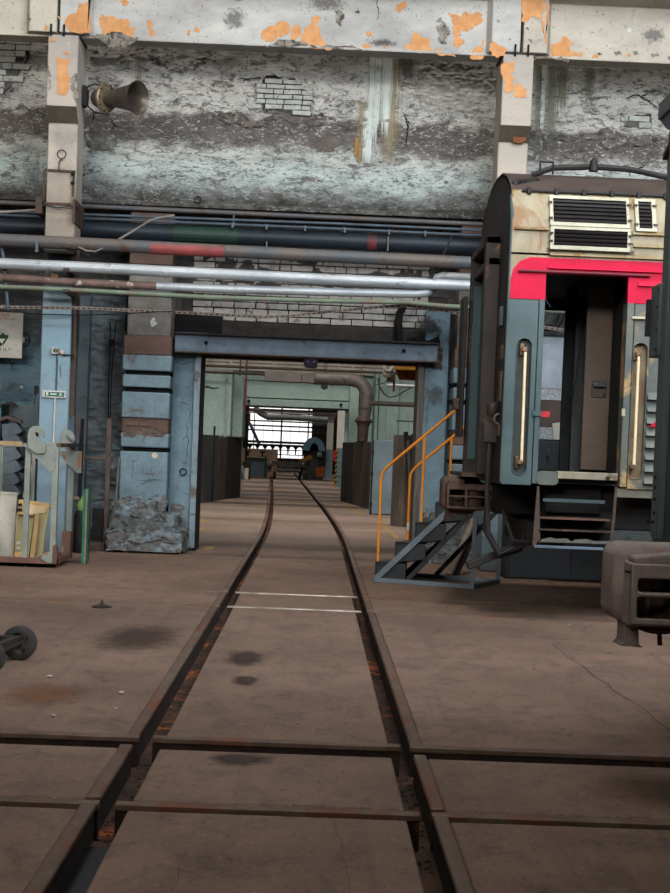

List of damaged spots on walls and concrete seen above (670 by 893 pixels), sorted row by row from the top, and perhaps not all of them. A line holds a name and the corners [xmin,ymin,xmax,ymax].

spalling [58,0,219,71]
peeling [261,15,372,52]
peeling [521,0,602,62]
flaking render [0,41,31,94]
spalling [0,103,46,113]
peeling [47,51,79,103]
flaking render [201,73,363,130]
damp [358,57,413,163]
spalling [405,11,527,120]
spalling [313,136,344,152]
flaking render [86,295,165,542]